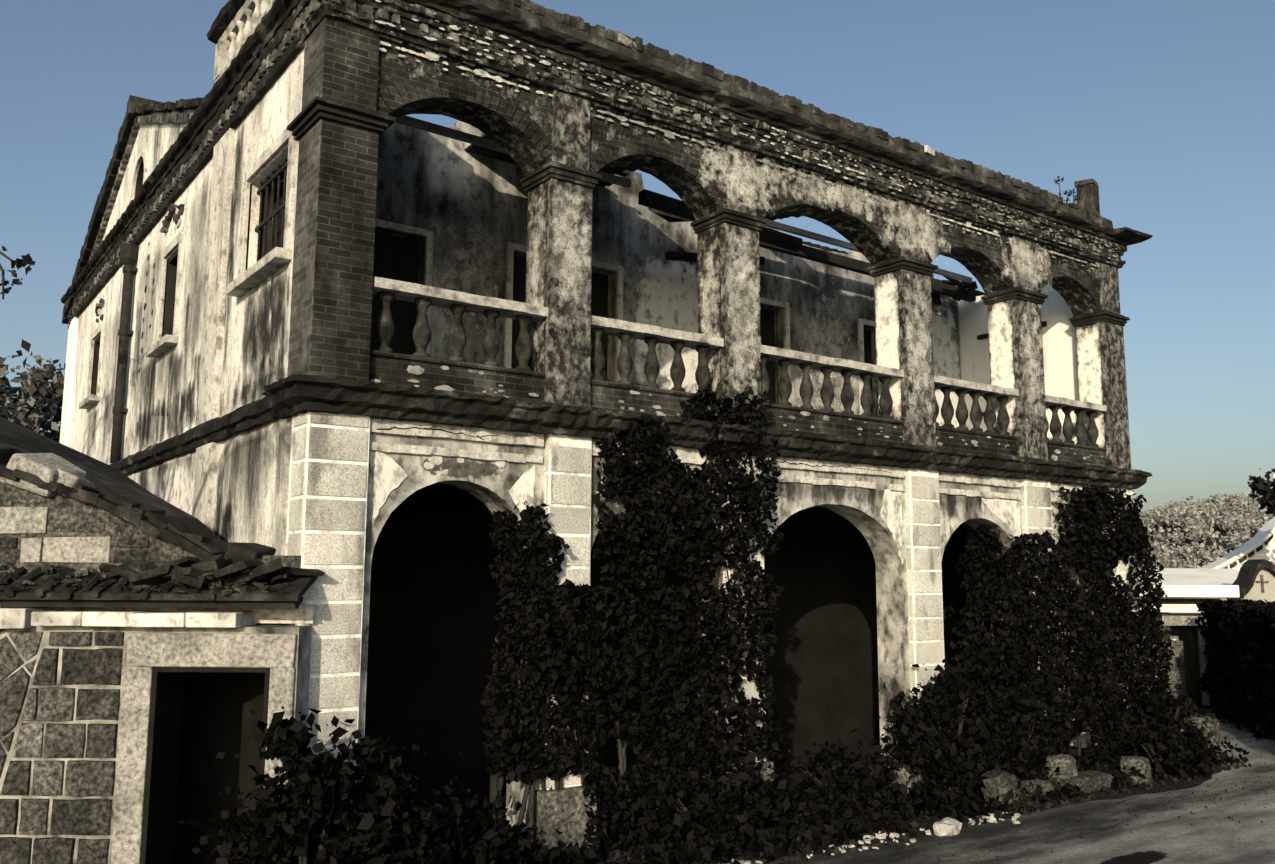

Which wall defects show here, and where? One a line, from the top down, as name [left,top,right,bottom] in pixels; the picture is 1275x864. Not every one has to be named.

leakage [230,139,242,231]
peeling [376,4,1118,272]
leakage [89,318,120,438]
leakage [136,261,201,448]
leakage [220,274,289,411]
peeling [407,365,424,387]
leakage [141,455,191,487]
peeling [151,460,195,515]
leakage [213,434,283,543]
spalling [422,455,506,478]
flaking render [0,494,325,588]